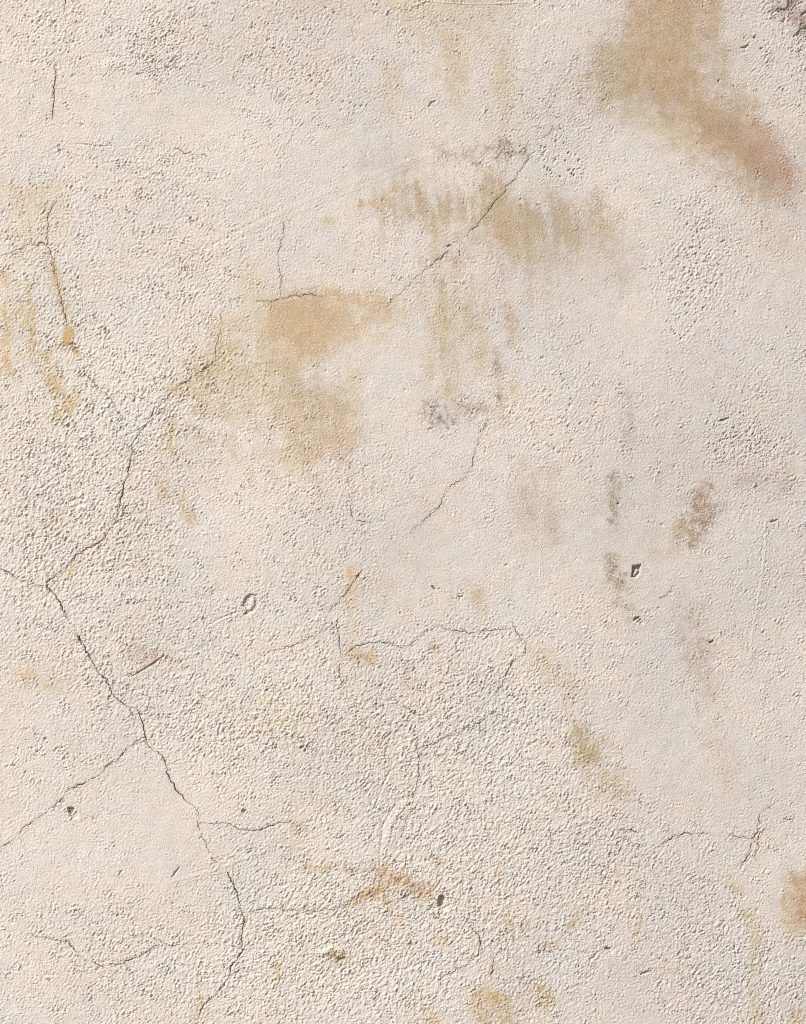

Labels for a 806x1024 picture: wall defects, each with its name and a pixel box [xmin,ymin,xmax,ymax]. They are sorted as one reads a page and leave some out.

damp [158,0,646,502]
crack [391,126,554,302]
damp [566,0,806,268]
crack [0,202,354,1024]
crack [270,570,540,837]
damp [511,450,565,551]